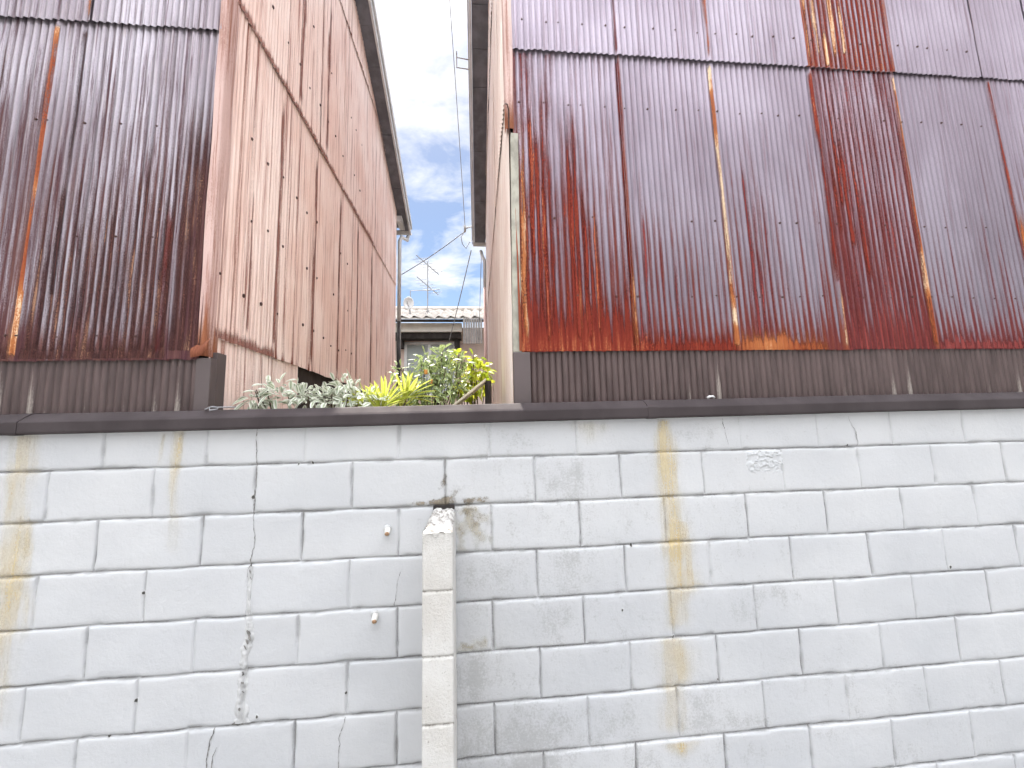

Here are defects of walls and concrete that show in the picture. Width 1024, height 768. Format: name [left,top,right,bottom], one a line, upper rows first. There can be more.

rust [0,26,213,359]
rust [513,0,827,352]
rust [801,0,1024,349]
crack [247,433,258,577]
peeling [746,449,784,475]
crack [206,722,253,768]